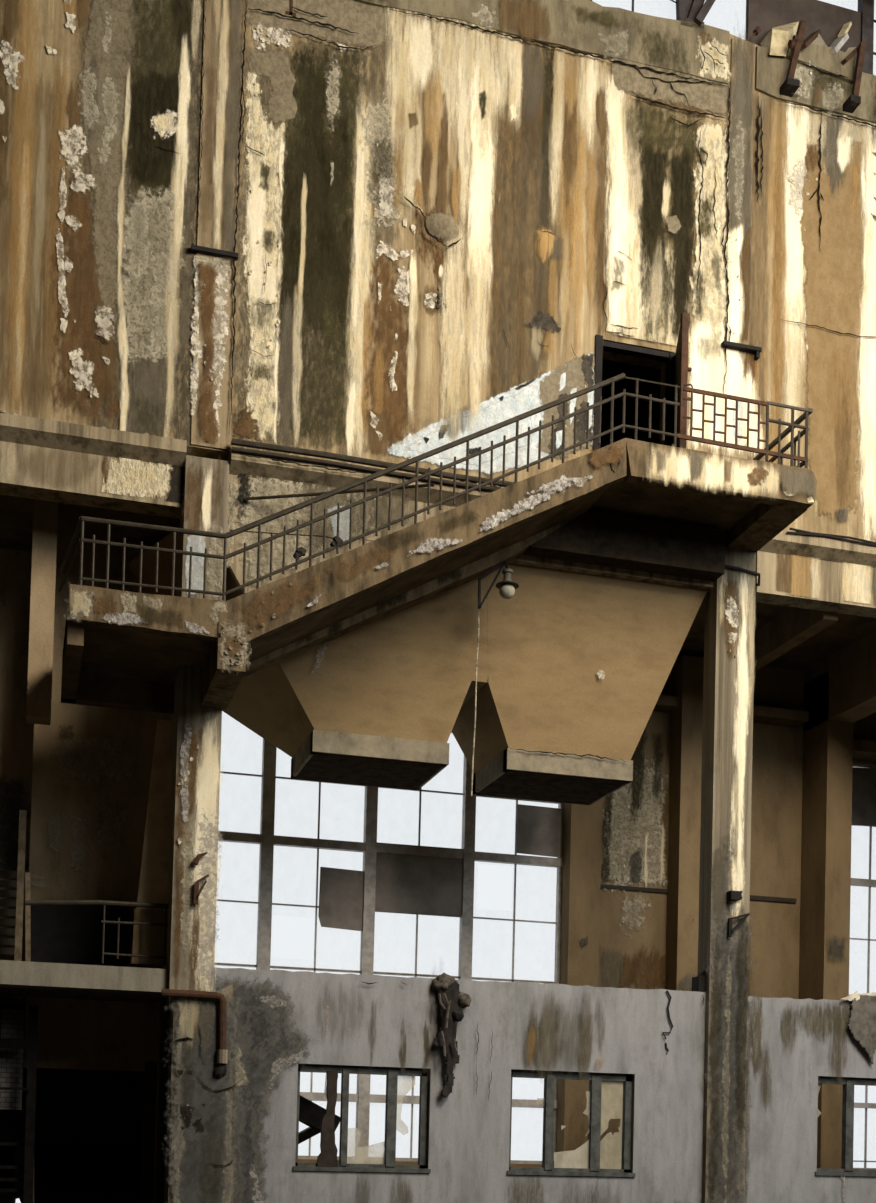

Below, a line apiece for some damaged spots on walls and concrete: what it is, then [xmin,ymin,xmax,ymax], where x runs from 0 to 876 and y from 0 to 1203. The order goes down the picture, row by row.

peeling [0,40,25,90]
damp [64,0,203,448]
peeling [56,0,292,443]
damp [213,0,704,456]
crack [389,9,876,394]
peeling [370,352,595,474]
damp [478,475,592,532]
corrosion [737,343,759,412]
corrosion [175,722,220,989]
peeling [601,730,670,929]
damp [705,576,771,1203]
damp [164,976,309,1203]